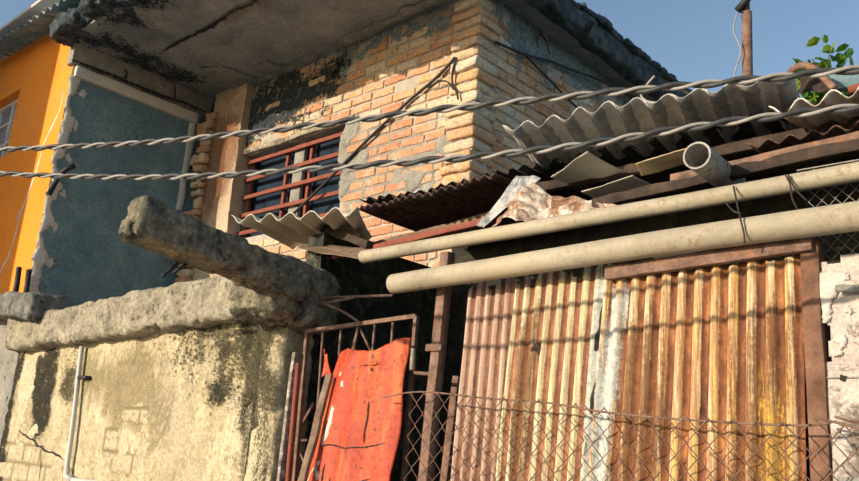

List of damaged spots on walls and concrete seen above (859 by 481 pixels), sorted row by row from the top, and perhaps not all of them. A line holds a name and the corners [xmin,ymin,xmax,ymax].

crack [161,0,258,52]
crack [0,89,64,273]
flaking render [29,75,87,294]
spalling [183,112,220,221]
spalling [174,264,195,283]
damp [0,352,25,481]
crack [18,430,62,476]
damp [31,348,78,441]
damp [202,327,228,415]
damp [237,321,262,481]
corrosion [610,301,666,481]
corrosion [726,298,802,481]